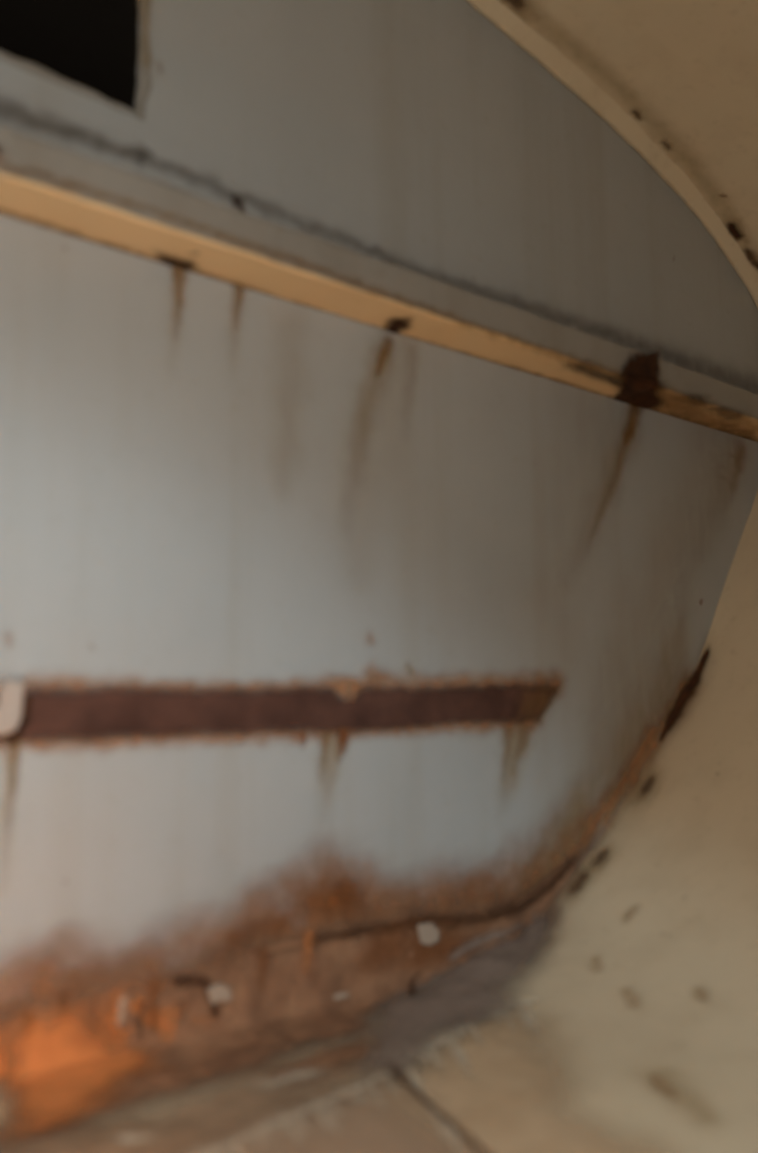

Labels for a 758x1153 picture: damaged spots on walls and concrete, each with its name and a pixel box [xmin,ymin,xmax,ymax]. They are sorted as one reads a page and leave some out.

rust [3,211,274,297]
rust [377,319,410,374]
rust [579,352,758,442]
rust [0,676,561,758]
peeling [417,922,440,945]
peeling [207,983,232,1005]